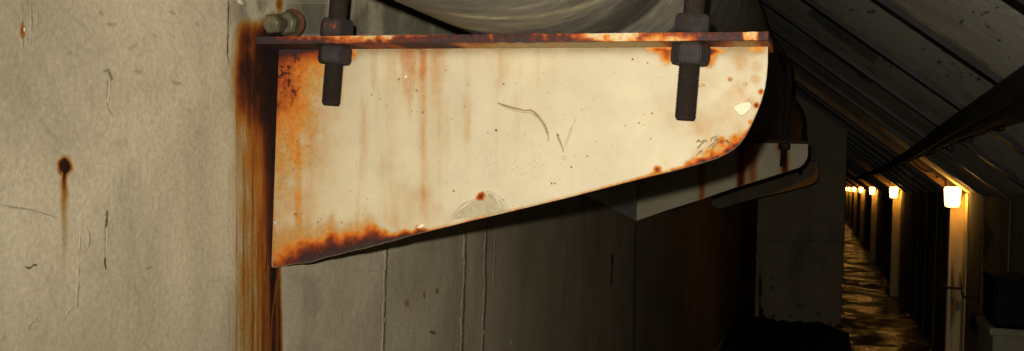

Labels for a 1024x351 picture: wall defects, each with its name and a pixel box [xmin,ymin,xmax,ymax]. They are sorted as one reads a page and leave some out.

rust [57,156,73,226]
rust [234,0,525,351]
rust [545,89,817,208]